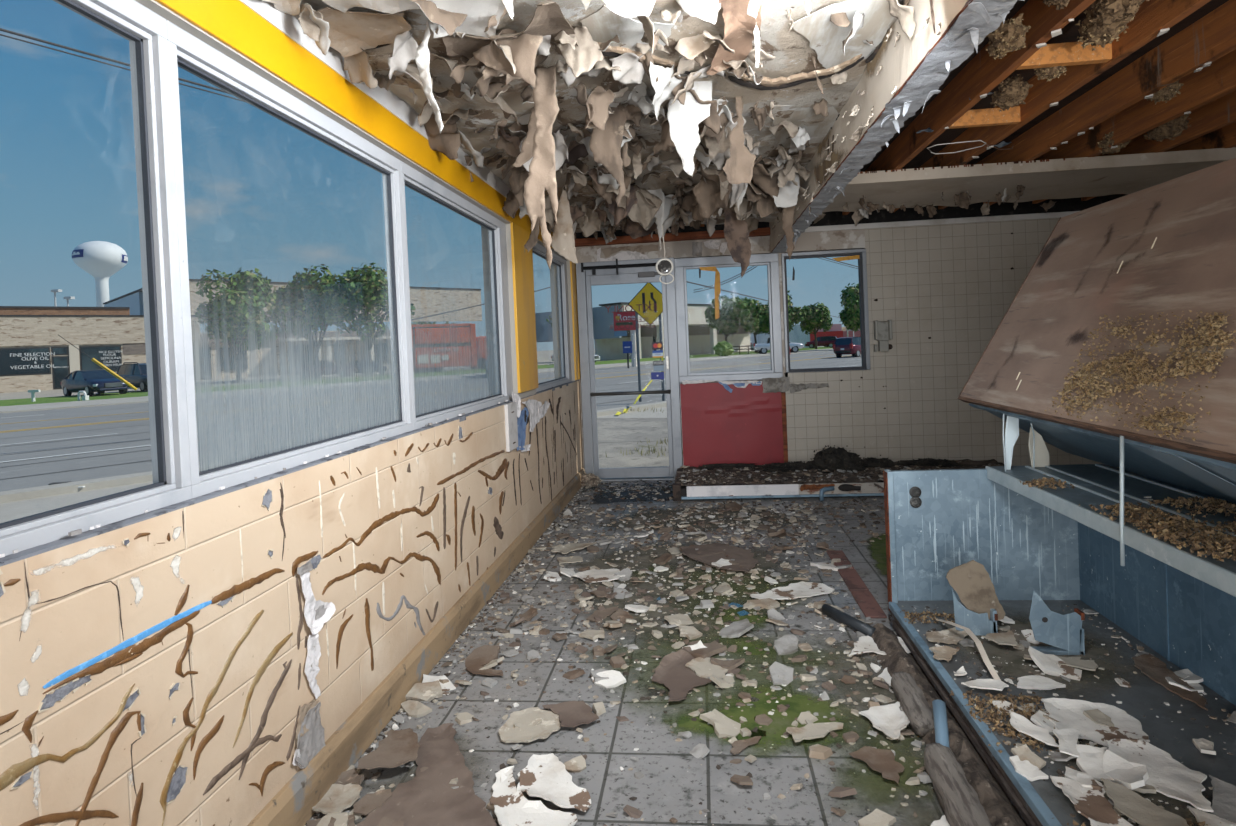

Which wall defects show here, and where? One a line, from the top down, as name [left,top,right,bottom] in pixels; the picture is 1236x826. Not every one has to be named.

peeling [967,2,1010,52]
peeling [942,185,1026,216]
crack [278,483,286,560]
crack [19,562,124,641]
peeling [286,553,336,769]
spalling [38,674,92,713]
crack [131,738,140,796]